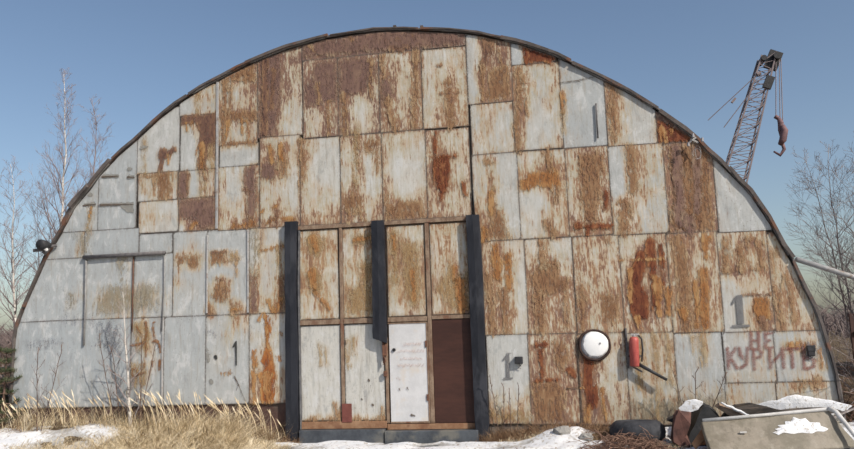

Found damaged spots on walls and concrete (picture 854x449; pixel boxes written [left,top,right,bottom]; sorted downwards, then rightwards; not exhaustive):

rust [175,250,240,274]
rust [139,53,308,230]
rust [207,244,285,405]
rust [306,234,331,311]
rust [303,32,462,245]
rust [383,193,426,307]
rust [479,38,494,101]
rust [520,148,561,204]
rust [530,218,608,423]
rust [574,87,639,244]
rust [601,121,777,391]
rust [742,272,797,331]